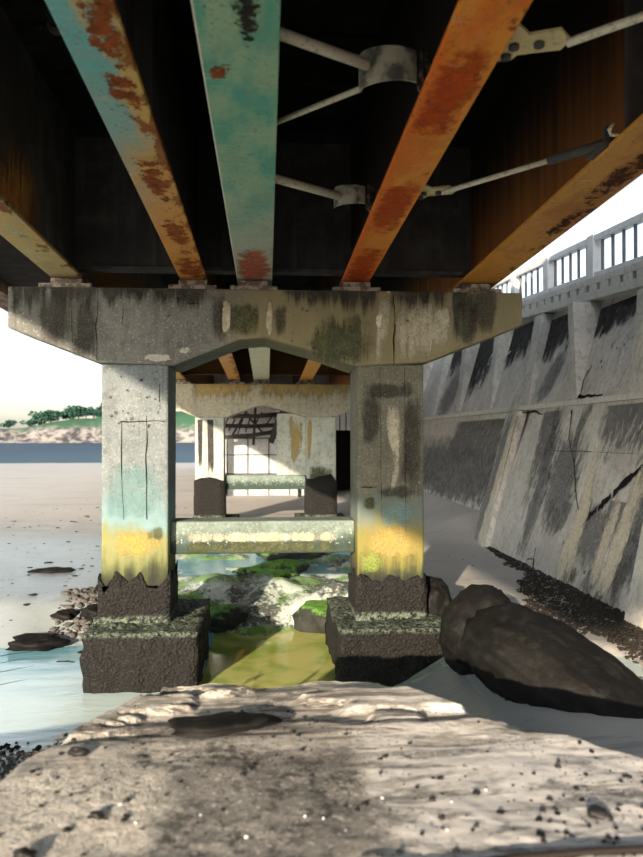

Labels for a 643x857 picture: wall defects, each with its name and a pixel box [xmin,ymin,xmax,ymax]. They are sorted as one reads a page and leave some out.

rust [75,0,143,119]
rust [229,0,260,47]
rust [0,146,32,224]
rust [134,160,169,202]
rust [542,154,643,239]
water stain [286,288,496,401]
crack [393,303,405,402]
water stain [502,321,534,375]
water stain [594,295,637,338]
water stain [363,384,512,538]
water stain [518,403,643,606]
crack [562,366,643,522]